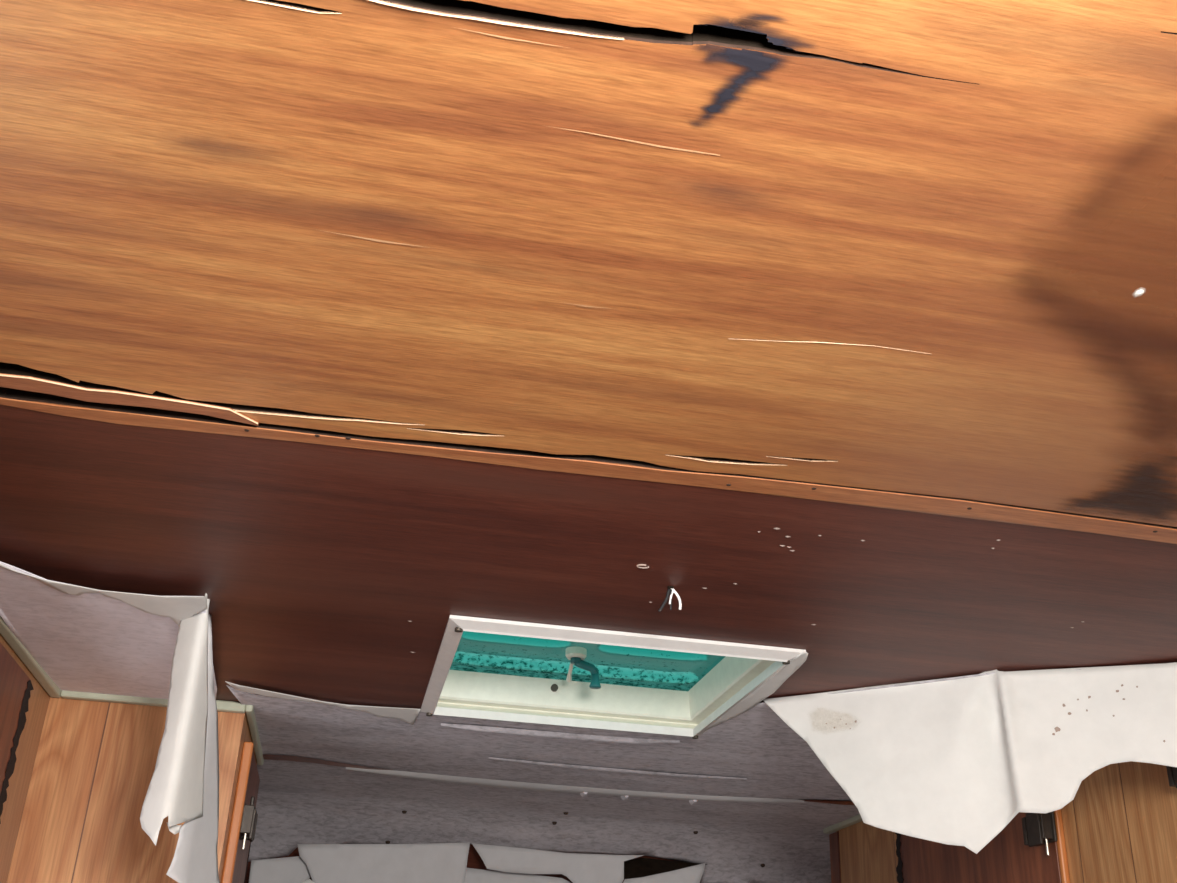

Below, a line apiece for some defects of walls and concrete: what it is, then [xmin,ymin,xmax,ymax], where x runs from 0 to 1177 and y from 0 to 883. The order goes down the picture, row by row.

crack [248,0,342,14]
crack [368,0,976,84]
water stain [695,14,808,125]
crack [728,338,932,354]
crack [0,362,1177,529]
water stain [1072,466,1177,518]